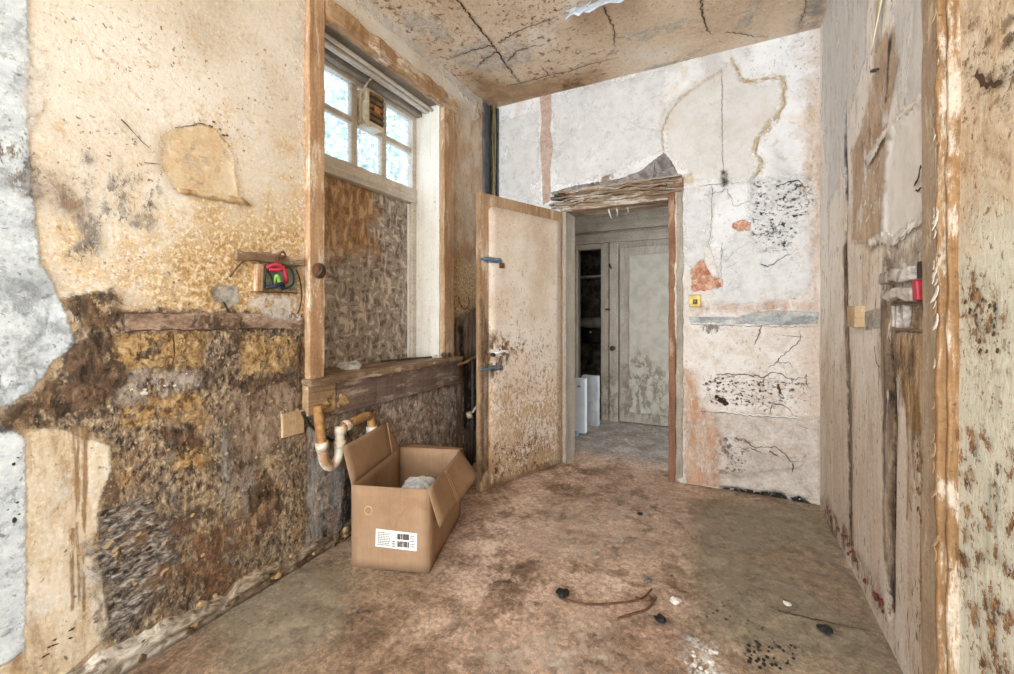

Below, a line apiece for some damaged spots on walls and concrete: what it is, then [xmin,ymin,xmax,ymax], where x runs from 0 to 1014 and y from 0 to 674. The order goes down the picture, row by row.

crack [454,0,620,86]
crack [699,0,767,38]
flaking render [0,0,74,407]
water stain [53,180,82,211]
water stain [119,174,159,231]
peeling [551,153,679,196]
spalling [706,171,813,267]
corrosion [956,272,1006,367]
peeling [108,331,202,406]
water stain [880,285,923,612]
peeling [0,426,180,674]
corrosion [955,424,1014,674]